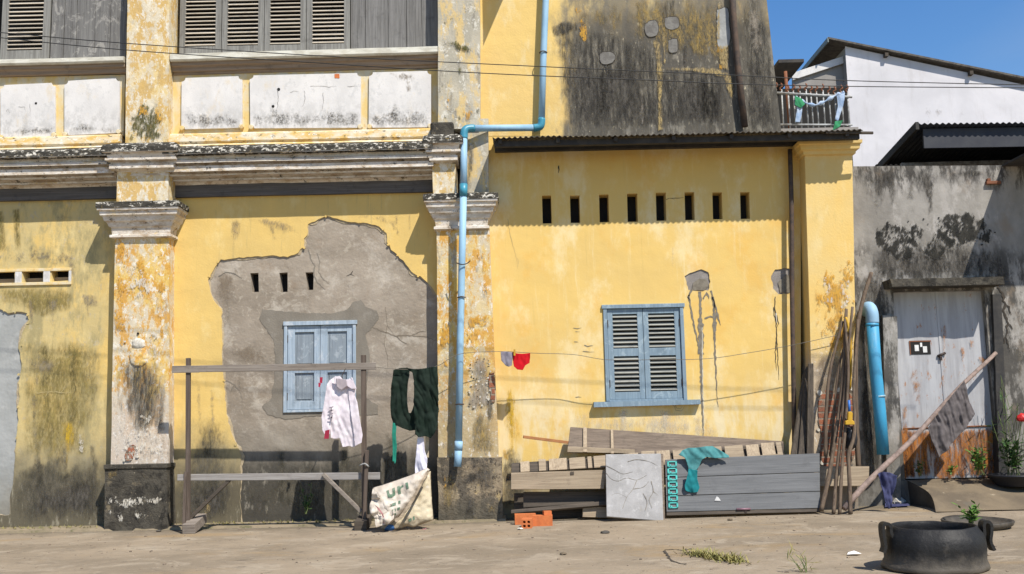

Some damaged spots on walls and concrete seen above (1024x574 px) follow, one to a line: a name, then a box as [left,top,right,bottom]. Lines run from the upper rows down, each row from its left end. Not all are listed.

leakage [553,0,733,131]
leakage [744,0,773,128]
leakage [0,210,20,248]
spalling [0,309,29,515]
leakage [22,414,99,519]
peeling [109,496,161,521]
peeling [114,242,166,357]
spalling [208,215,453,522]
spalling [468,358,495,408]
spalling [817,261,856,466]
leakage [854,212,1006,478]
rust [901,408,994,479]